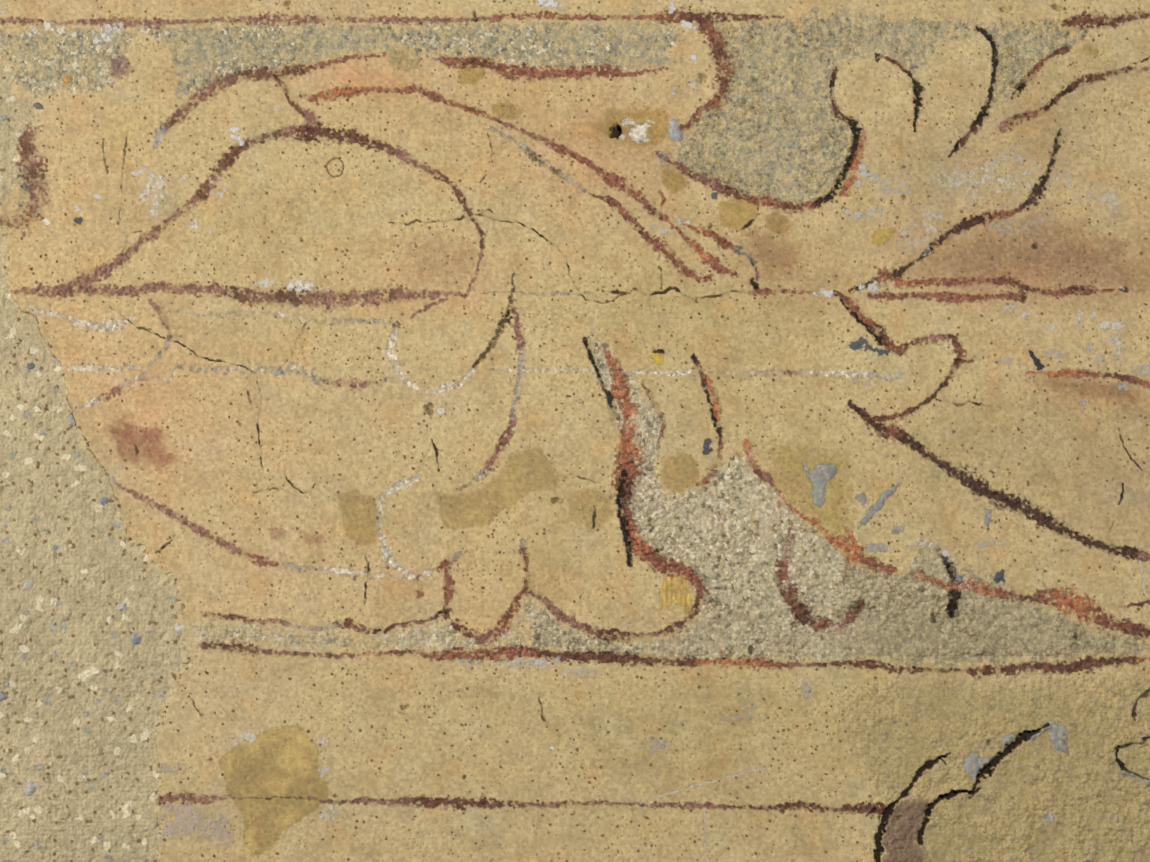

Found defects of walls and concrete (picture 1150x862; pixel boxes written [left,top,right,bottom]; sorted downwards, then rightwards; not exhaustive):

spalling [0,20,682,105]
spalling [658,6,1091,205]
spalling [189,329,1150,862]
crack [871,723,1049,862]
crack [1115,689,1150,780]